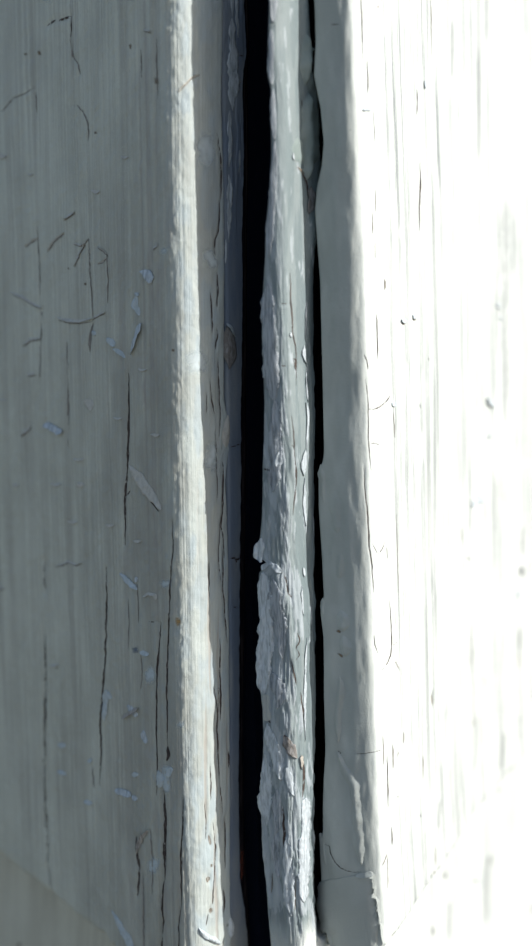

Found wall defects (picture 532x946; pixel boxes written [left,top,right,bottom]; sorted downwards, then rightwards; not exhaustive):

crack [214,135,222,247]
crack [281,278,297,380]
crack [290,420,298,512]
crack [364,314,399,669]
crack [92,273,242,946]
crack [291,633,304,712]
peeling [253,538,385,946]
crack [282,760,305,846]